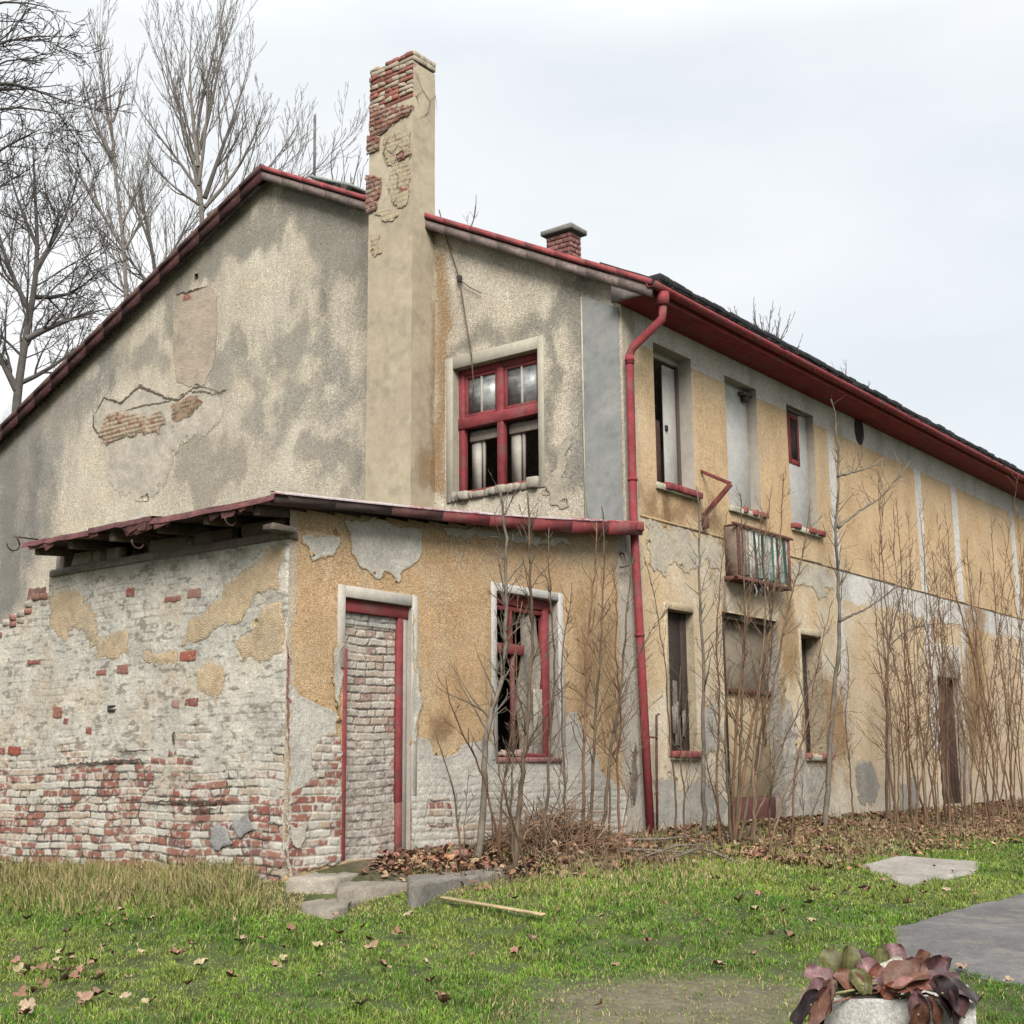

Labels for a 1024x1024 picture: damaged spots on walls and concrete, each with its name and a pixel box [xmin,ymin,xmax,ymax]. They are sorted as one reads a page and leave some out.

flaking render [364,50,436,215]
water stain [167,187,368,333]
water stain [0,352,114,624]
spalling [93,383,224,502]
crack [92,386,227,443]
water stain [175,433,246,510]
water stain [267,324,358,447]
peeling [301,517,423,583]
peeling [142,540,286,709]
spalling [37,640,345,880]
peeling [410,604,639,860]
spalling [0,813,139,871]